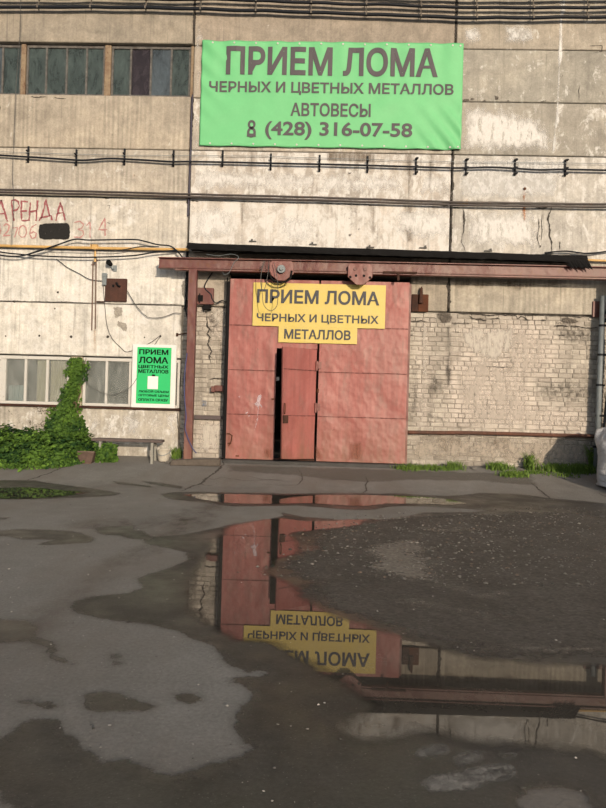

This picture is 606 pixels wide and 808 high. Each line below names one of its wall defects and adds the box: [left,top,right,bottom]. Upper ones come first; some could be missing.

leakage [463,160,563,197]
crack [537,207,560,250]